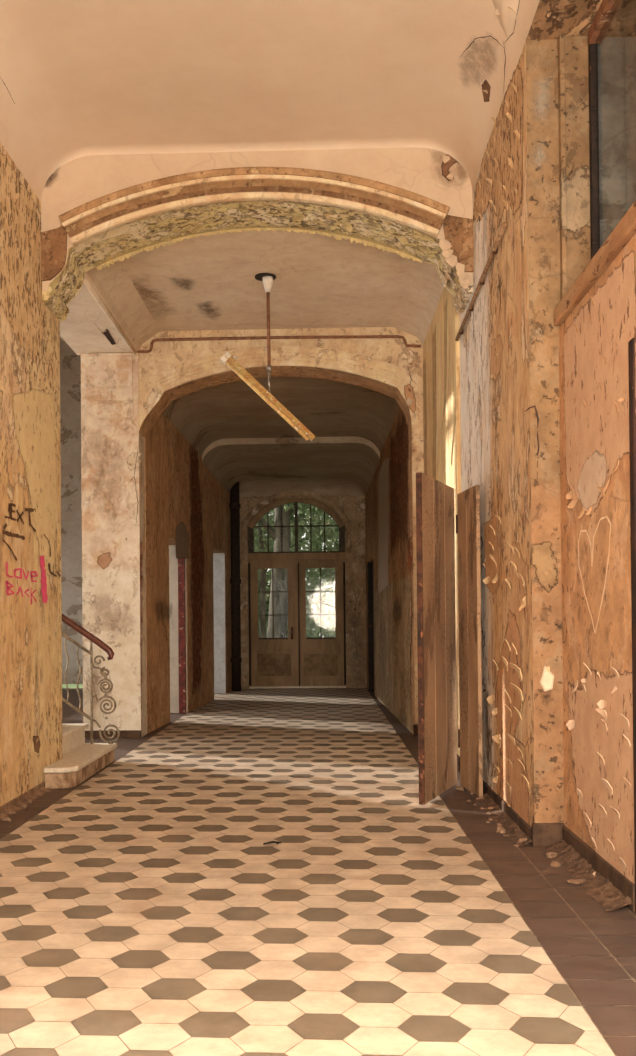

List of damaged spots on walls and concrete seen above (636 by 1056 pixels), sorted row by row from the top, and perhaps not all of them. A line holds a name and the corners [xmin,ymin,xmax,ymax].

peeling [473,65,523,227]
peeling [92,213,423,270]
flaking render [437,238,470,304]
peeling [489,335,503,382]
peeling [563,250,636,519]
peeling [483,513,561,825]
peeling [566,663,635,884]